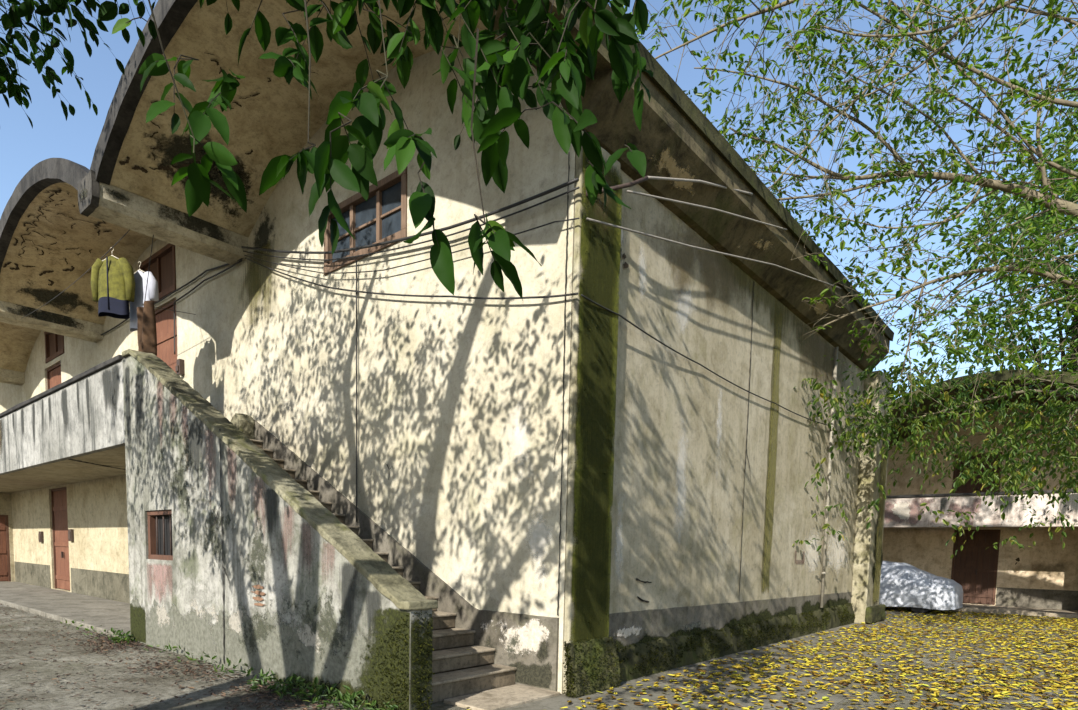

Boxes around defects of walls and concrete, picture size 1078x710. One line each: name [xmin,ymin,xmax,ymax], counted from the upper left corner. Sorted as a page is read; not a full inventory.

leakage [146,129,254,243]
spalling [658,149,694,190]
leakage [8,282,93,329]
leakage [0,379,90,451]
leakage [102,365,143,457]
leakage [162,418,204,508]
leakage [243,489,277,597]
peeling [884,498,932,524]
peeling [949,499,981,526]
spalling [131,585,379,703]
leakage [238,563,380,668]
spalling [480,618,549,654]